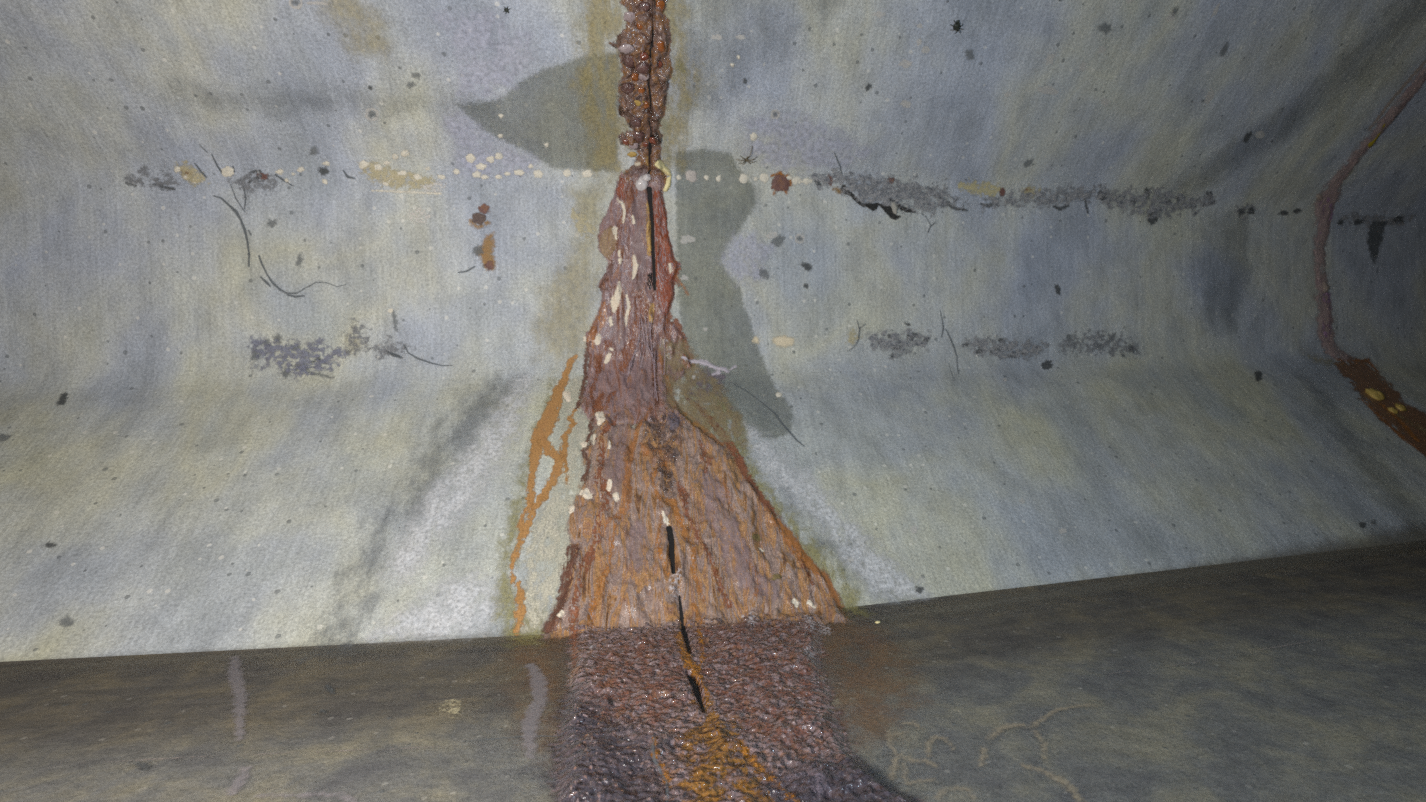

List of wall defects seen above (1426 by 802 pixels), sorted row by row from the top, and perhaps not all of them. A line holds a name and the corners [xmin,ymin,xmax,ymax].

corrosion [469,204,495,270]
crack [647,0,656,290]
spalling [811,168,1217,225]
corrosion [510,0,921,802]
corrosion [1333,355,1426,456]
crack [666,526,705,713]